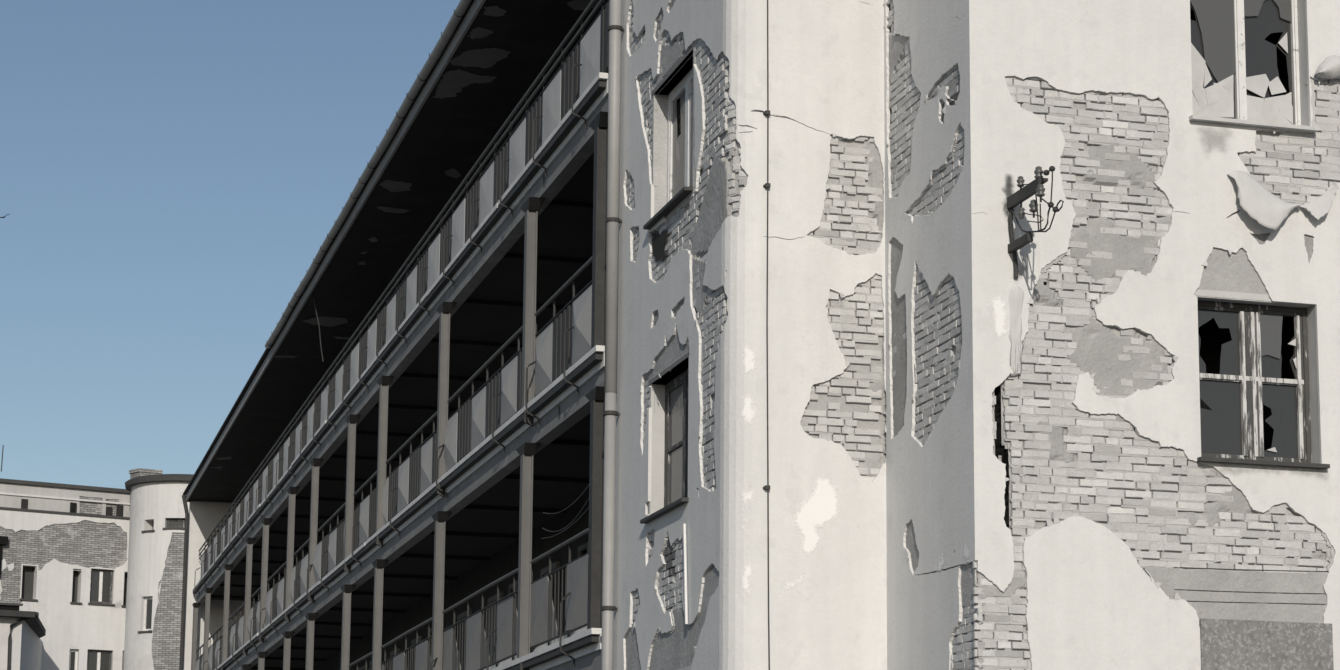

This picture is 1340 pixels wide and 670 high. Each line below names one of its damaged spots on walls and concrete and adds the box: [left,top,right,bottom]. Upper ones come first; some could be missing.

flaking render [625,172,635,209]
flaking render [629,0,752,491]
flaking render [793,0,965,481]
flaking render [950,76,1340,670]
flaking render [0,496,127,603]
flaking render [148,533,184,670]
flaking render [626,529,719,670]